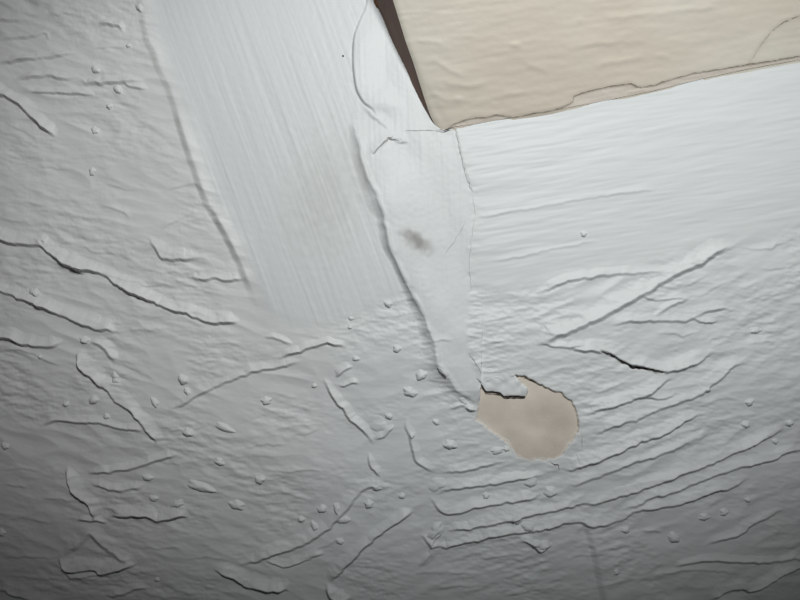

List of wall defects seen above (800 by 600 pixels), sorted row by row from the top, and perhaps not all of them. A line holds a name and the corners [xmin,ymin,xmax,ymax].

peeling [555,56,800,110]
peeling [450,116,511,127]
crack [602,351,662,372]
peeling [473,368,579,461]